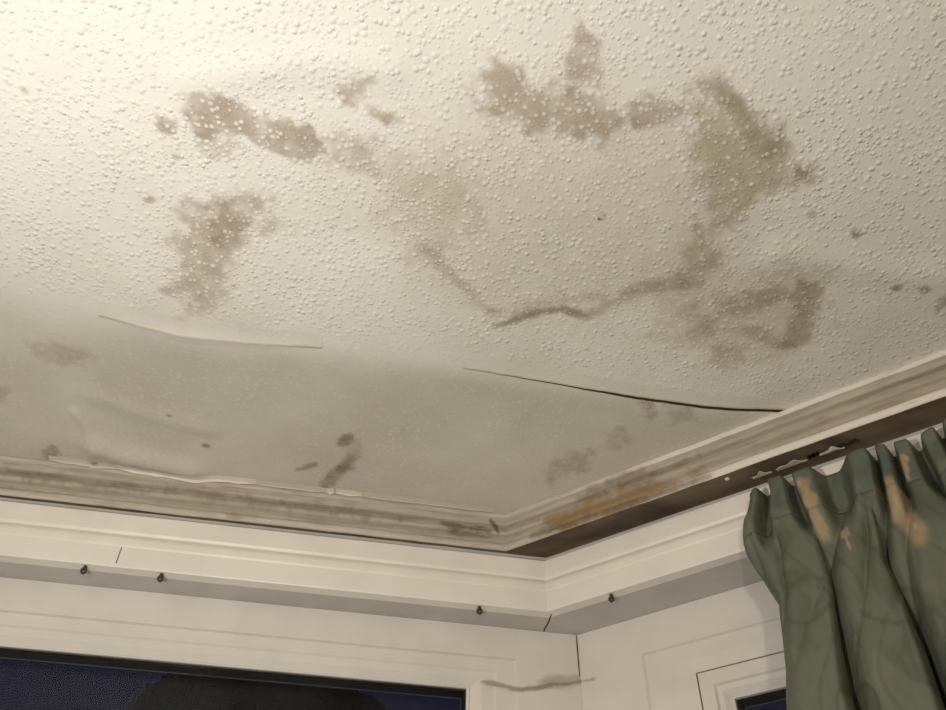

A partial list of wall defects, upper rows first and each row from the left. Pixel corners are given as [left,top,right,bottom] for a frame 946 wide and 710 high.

damp [186,99,250,134]
crack [484,635,580,691]